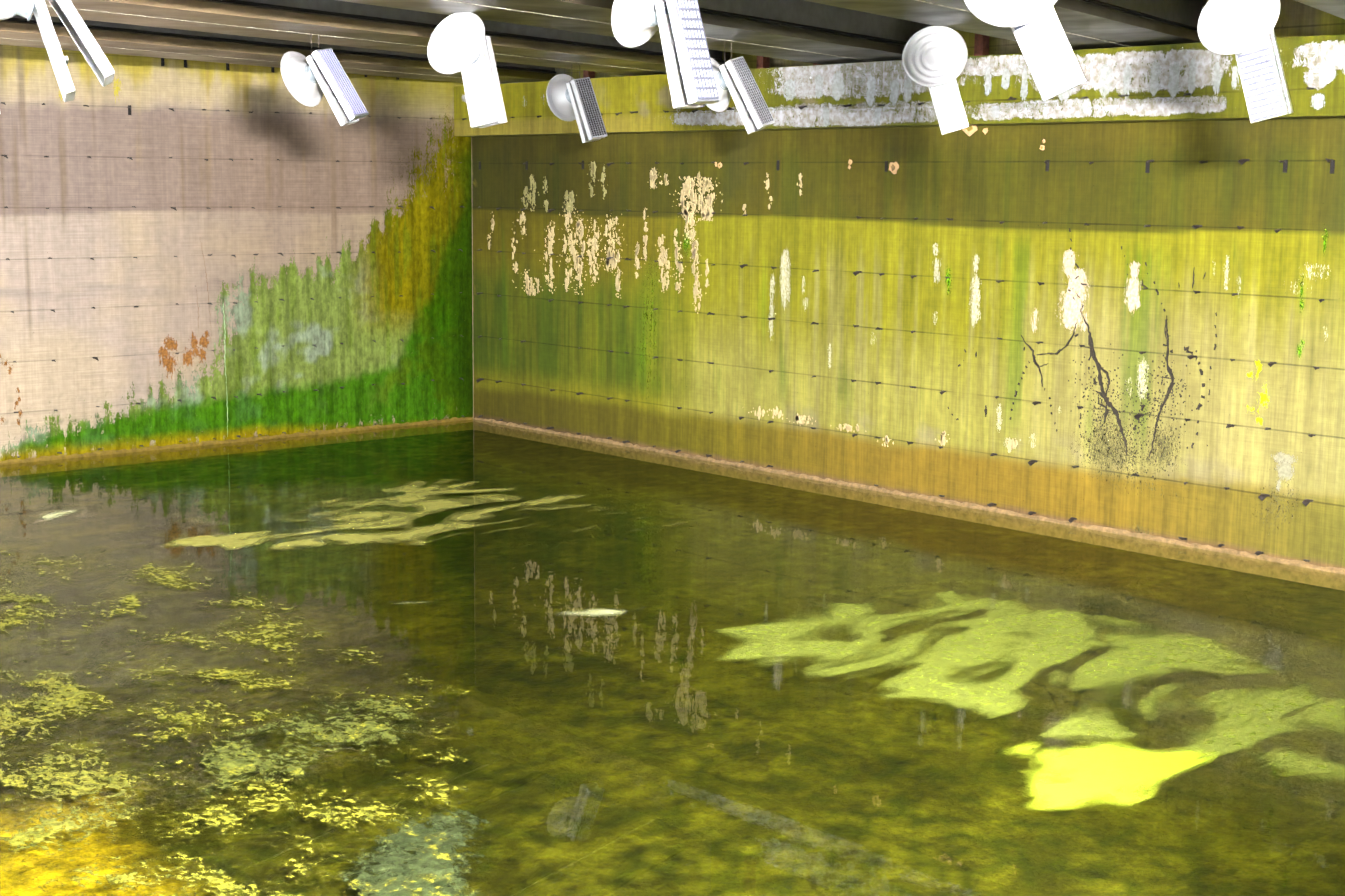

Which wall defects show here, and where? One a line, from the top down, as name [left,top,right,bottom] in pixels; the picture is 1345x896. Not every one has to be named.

spalling [962,125,988,136]
peeling [511,161,723,314]
rust [158,330,211,377]
crack [948,228,1217,477]
water stain [1071,357,1186,498]